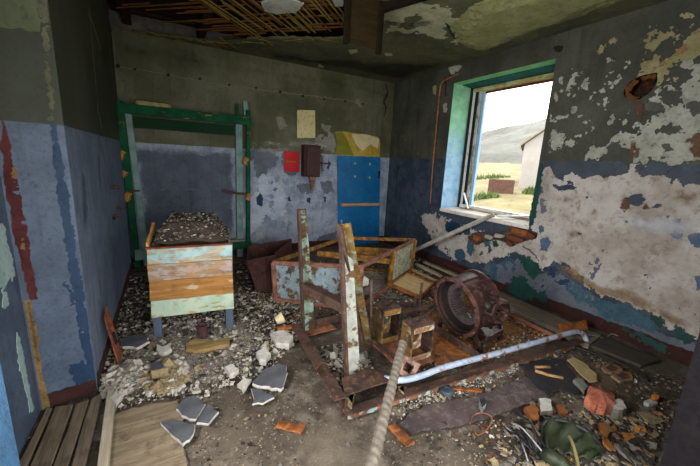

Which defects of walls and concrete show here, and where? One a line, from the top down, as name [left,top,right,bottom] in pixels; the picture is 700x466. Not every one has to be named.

crack [115,64,389,117]
peeling [315,123,337,169]
peeling [243,146,301,245]
peeling [297,180,334,203]
peeling [421,12,700,354]